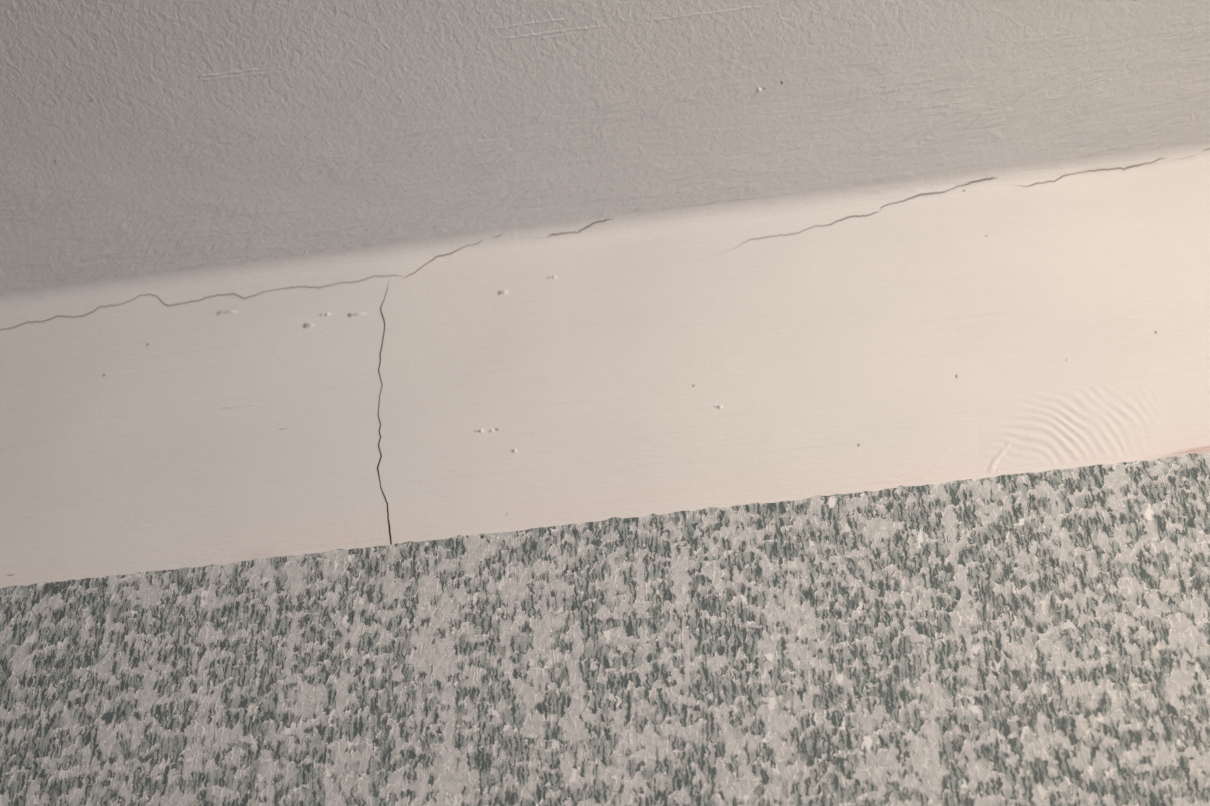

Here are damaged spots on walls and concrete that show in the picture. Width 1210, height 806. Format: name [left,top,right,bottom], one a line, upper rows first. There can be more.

crack [705,150,1210,258]
crack [375,278,392,545]